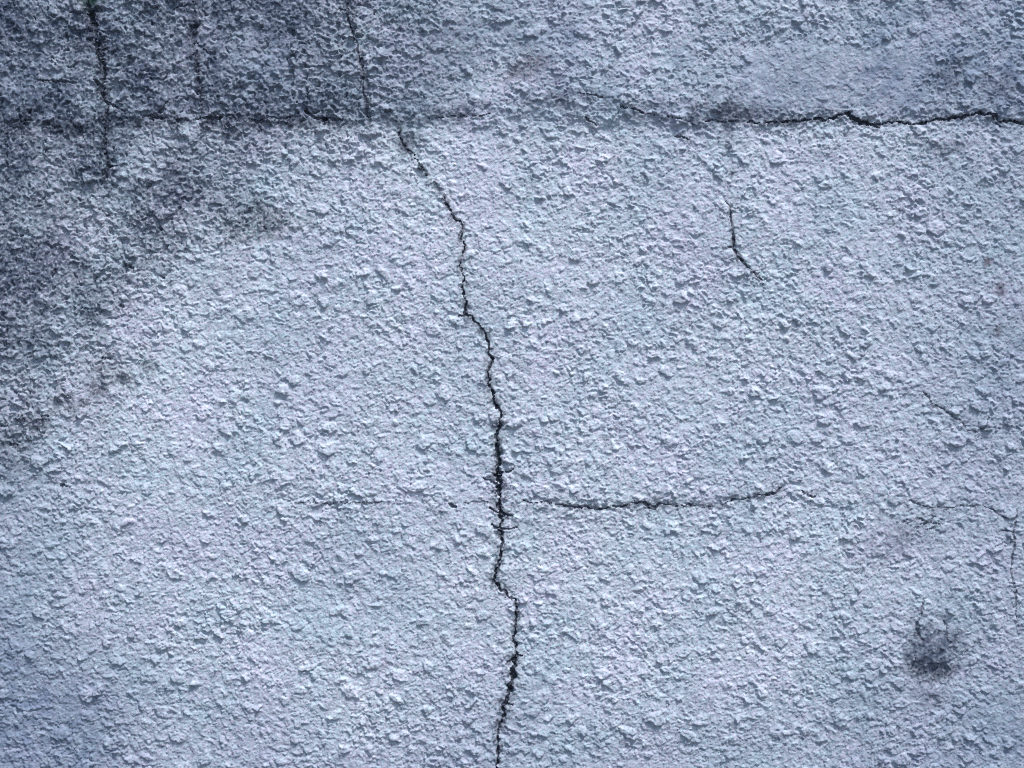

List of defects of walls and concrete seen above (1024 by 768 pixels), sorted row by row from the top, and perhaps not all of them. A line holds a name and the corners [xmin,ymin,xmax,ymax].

crack [34,0,368,177]
crack [428,112,490,120]
crack [577,92,1024,141]
leakage [0,0,350,352]
crack [396,120,816,768]
crack [923,391,1001,434]
crack [287,498,382,506]
crack [909,500,1020,627]
crack [910,600,968,670]